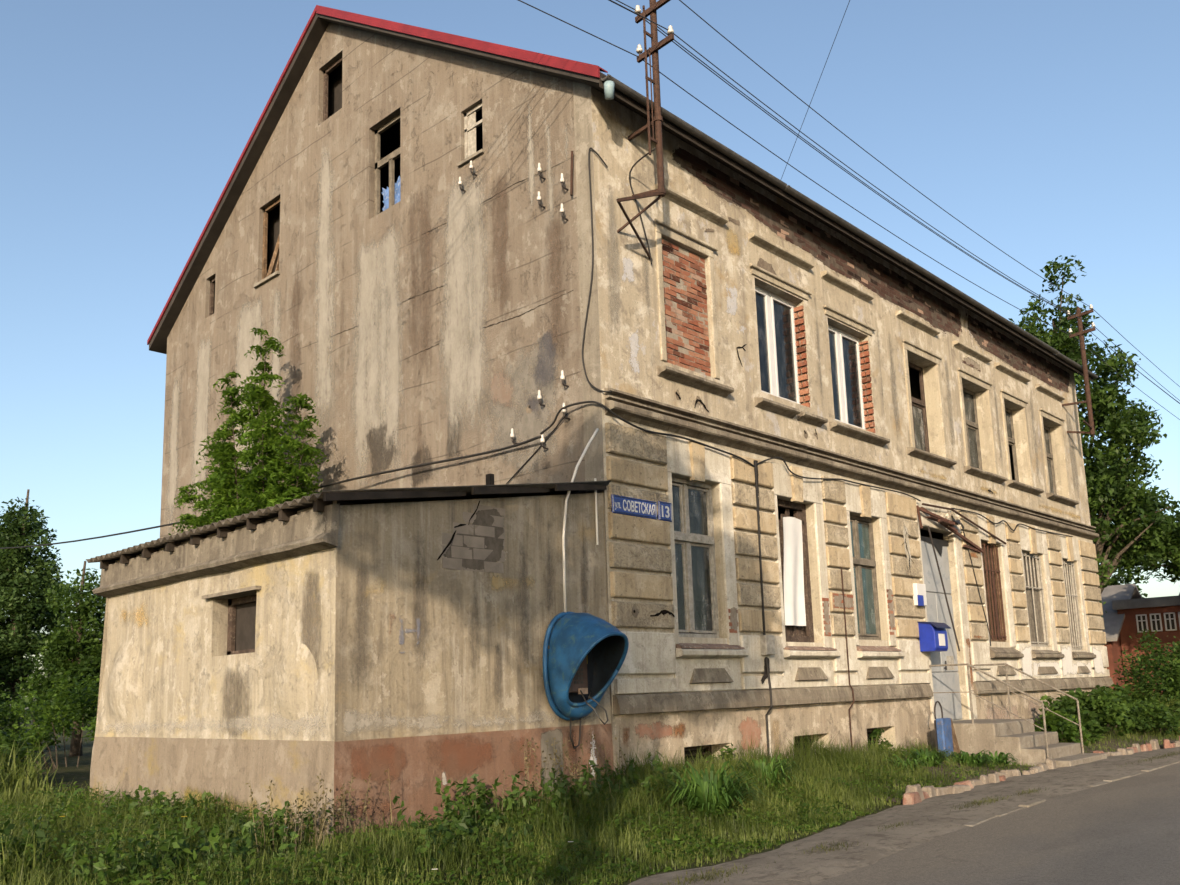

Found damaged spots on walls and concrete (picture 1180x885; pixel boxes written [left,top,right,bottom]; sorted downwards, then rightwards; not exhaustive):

water stain [167,381,180,528]
water stain [192,338,212,509]
water stain [234,292,280,470]
water stain [216,673,323,734]
water stain [302,575,321,663]
water stain [315,150,335,426]
water stain [355,572,368,678]
water stain [352,228,403,475]
peeling [427,736,491,779]
water stain [440,178,489,433]
spalling [442,504,505,573]
spalling [670,143,1070,394]